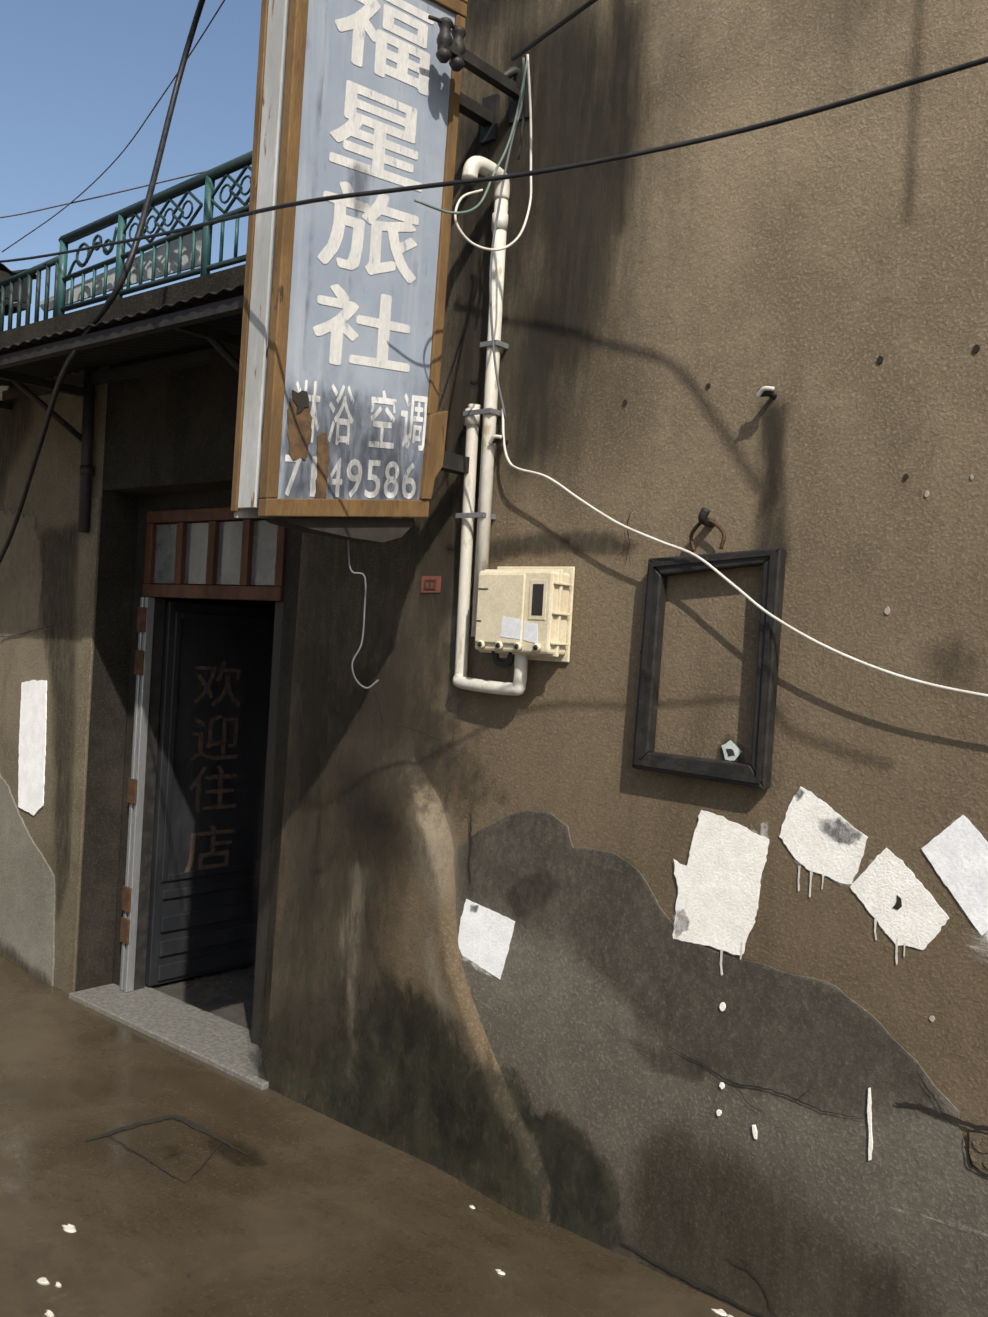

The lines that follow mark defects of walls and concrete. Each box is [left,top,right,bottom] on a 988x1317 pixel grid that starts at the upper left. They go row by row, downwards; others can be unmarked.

water stain [447,0,639,461]
water stain [760,404,785,549]
water stain [254,472,629,1250]
crack [667,1046,863,1119]
crack [895,1071,988,1177]
flaking render [969,1132,988,1174]